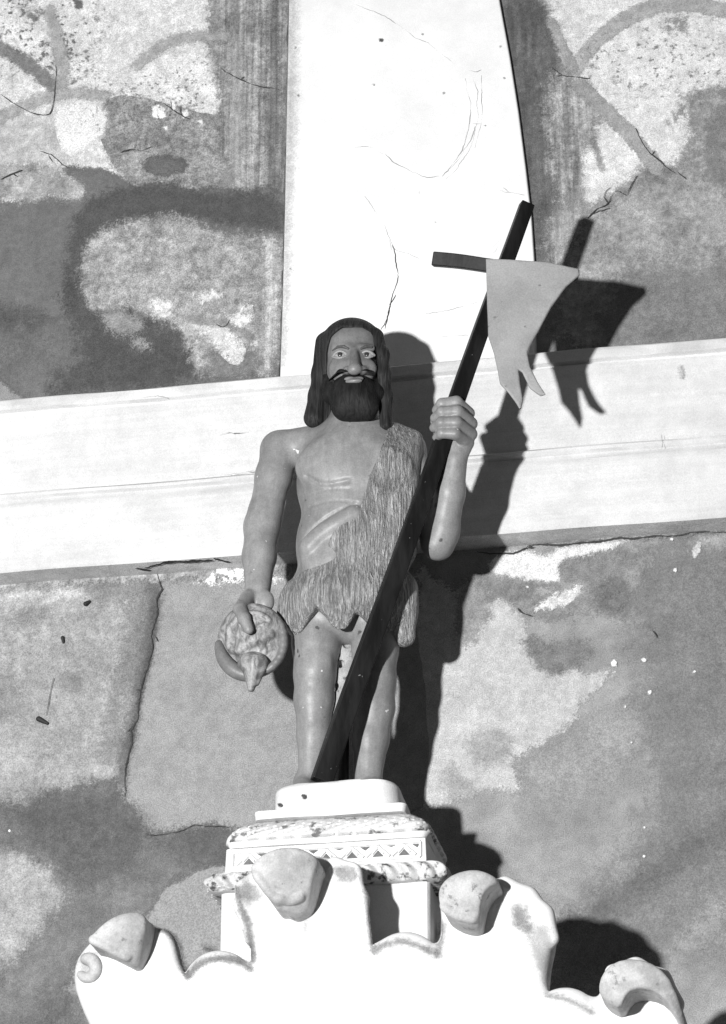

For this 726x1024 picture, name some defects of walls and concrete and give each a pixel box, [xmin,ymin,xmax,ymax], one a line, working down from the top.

damp [0,0,285,398]
crack [587,128,686,218]
crack [477,531,723,554]
crack [117,558,230,797]
damp [500,539,726,990]
damp [0,778,236,1024]